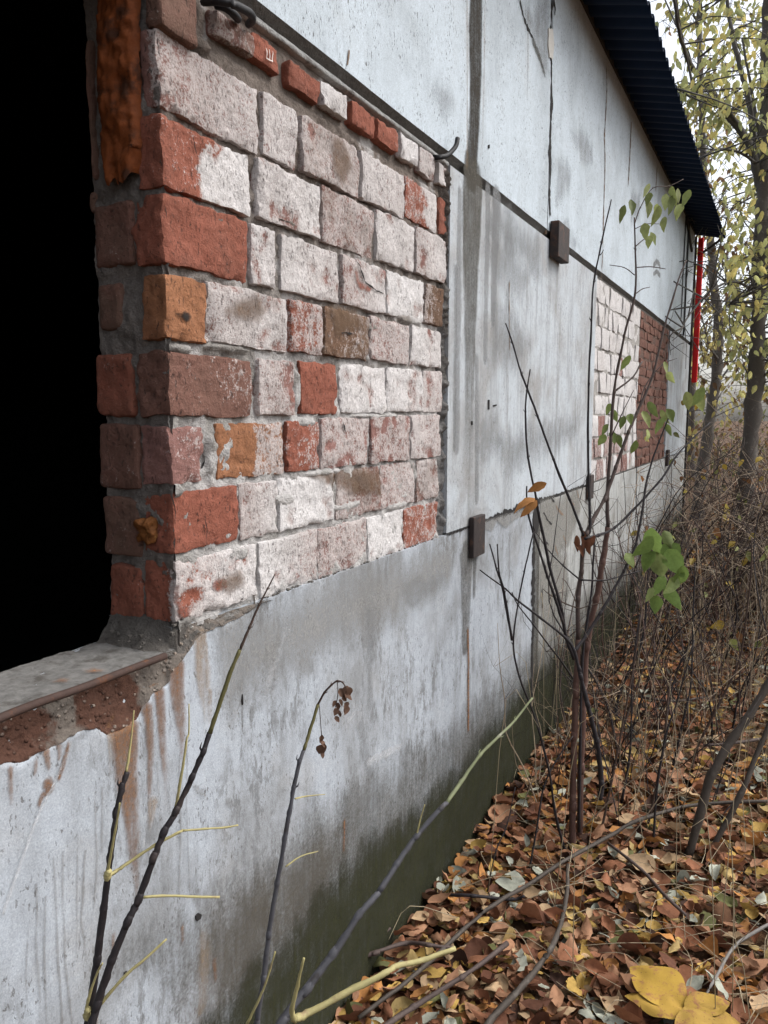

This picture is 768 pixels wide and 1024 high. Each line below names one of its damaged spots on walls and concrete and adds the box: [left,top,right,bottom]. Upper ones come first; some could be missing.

crack [549,0,557,29]
crack [547,58,555,216]
leakage [454,0,537,501]
spalling [0,539,433,765]
corrosion [36,746,69,806]
corrosion [108,661,184,842]